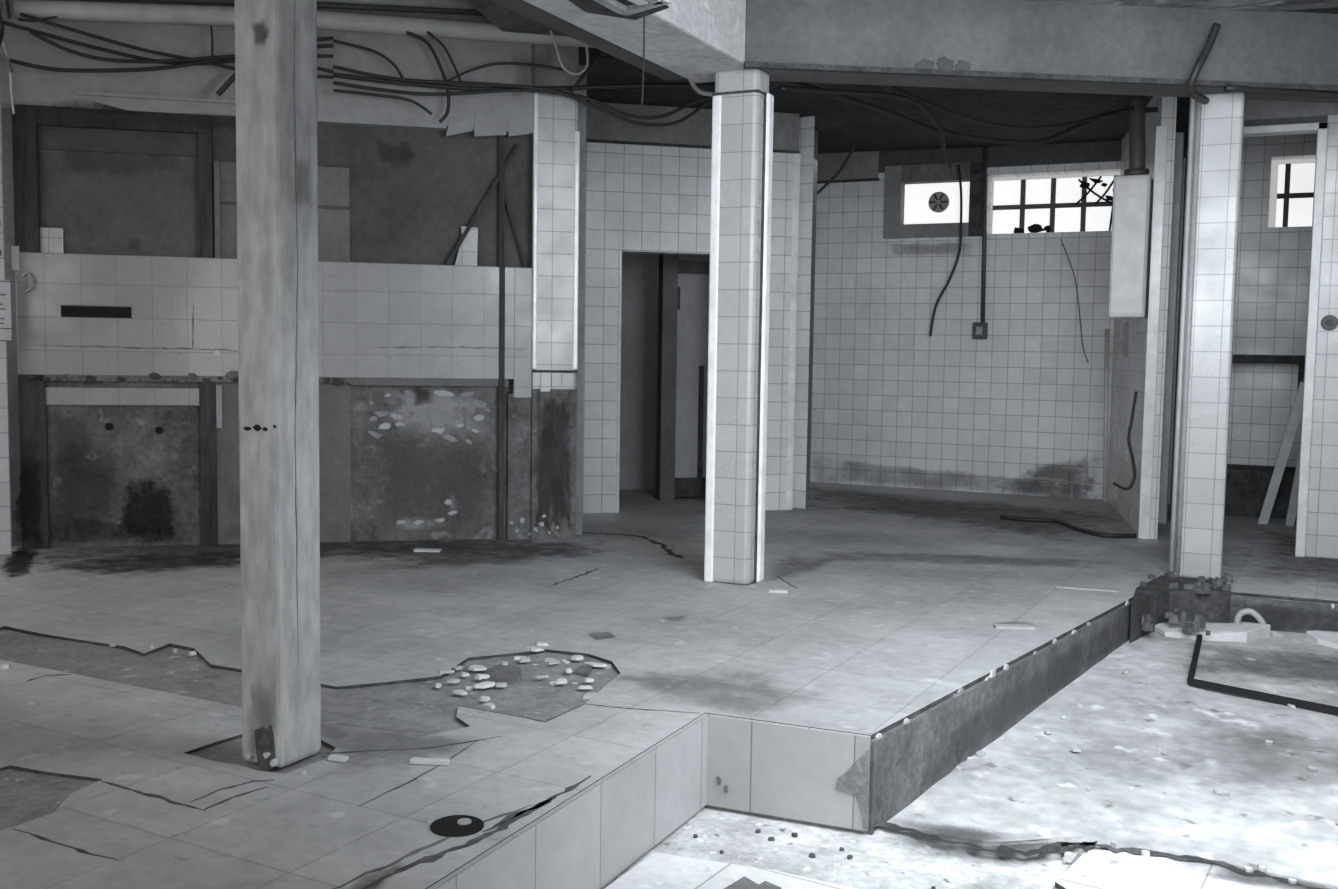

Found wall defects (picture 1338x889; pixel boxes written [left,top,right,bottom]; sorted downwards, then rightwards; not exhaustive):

flaking render [368,387,491,444]
water stain [2,426,241,577]
water stain [836,465,1095,535]
peeling [0,630,242,707]
peeling [321,642,618,734]
spalling [589,632,615,640]
spalling [1125,572,1233,643]
peeling [190,725,333,774]
crack [97,779,272,811]
crack [14,829,115,859]
crack [332,775,591,889]